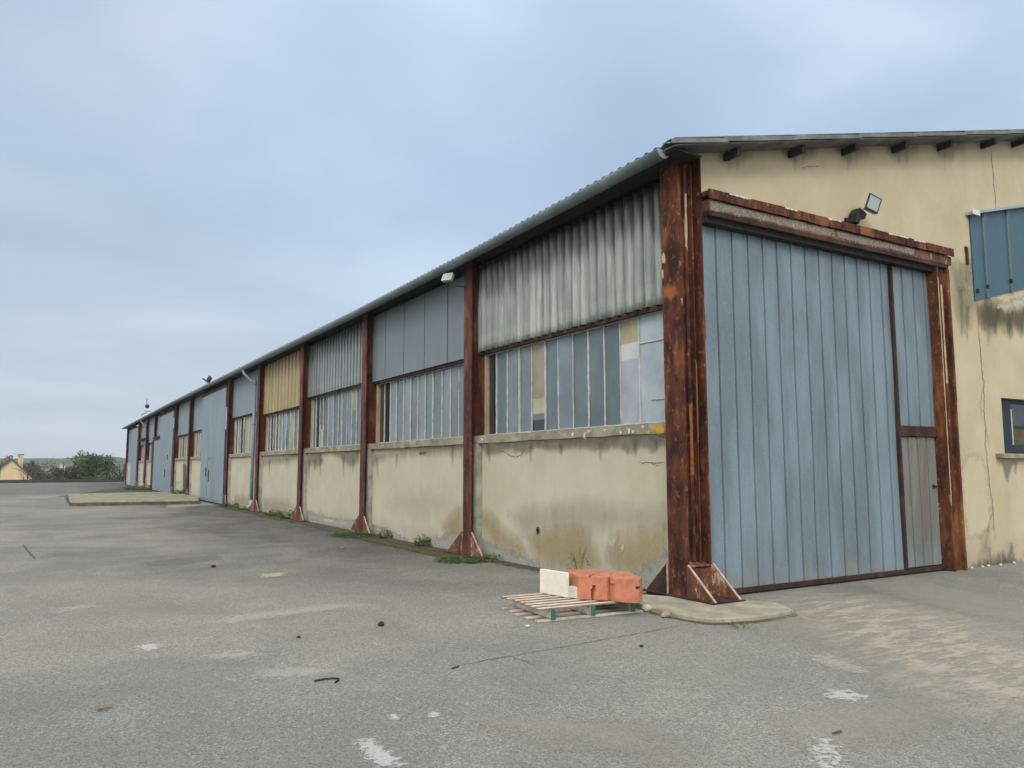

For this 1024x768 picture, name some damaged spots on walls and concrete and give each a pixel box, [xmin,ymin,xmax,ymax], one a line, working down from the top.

corrosion [663,283,678,302]
water stain [956,269,1024,331]
corrosion [689,363,699,475]